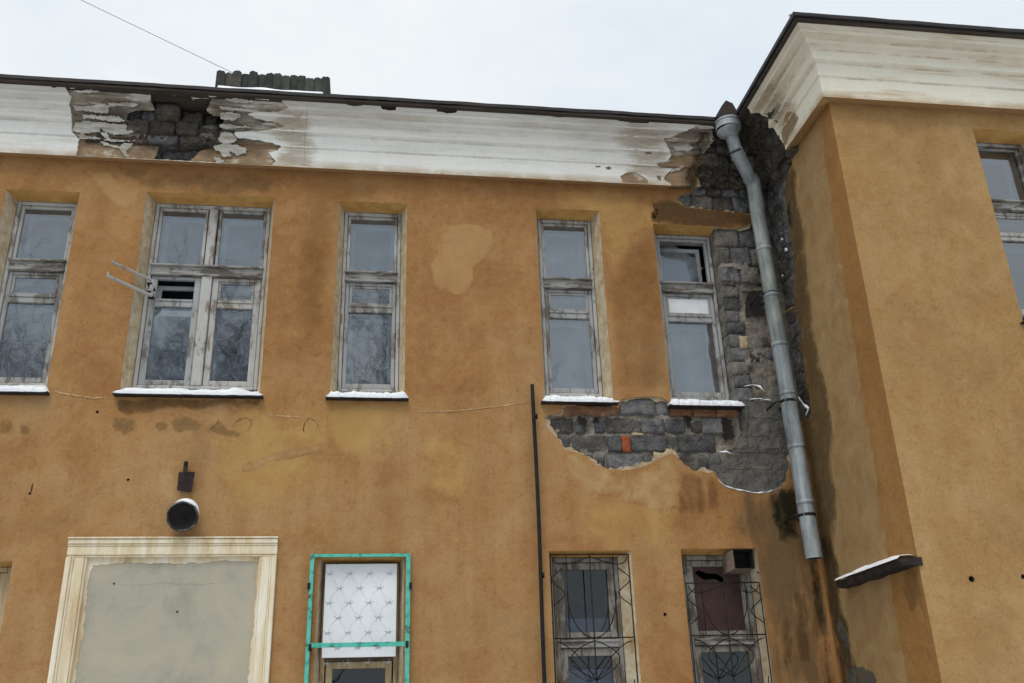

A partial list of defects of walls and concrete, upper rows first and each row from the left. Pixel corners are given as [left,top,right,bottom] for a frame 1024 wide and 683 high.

flaking render [68,88,289,165]
flaking render [545,109,811,494]
leakage [746,170,856,683]